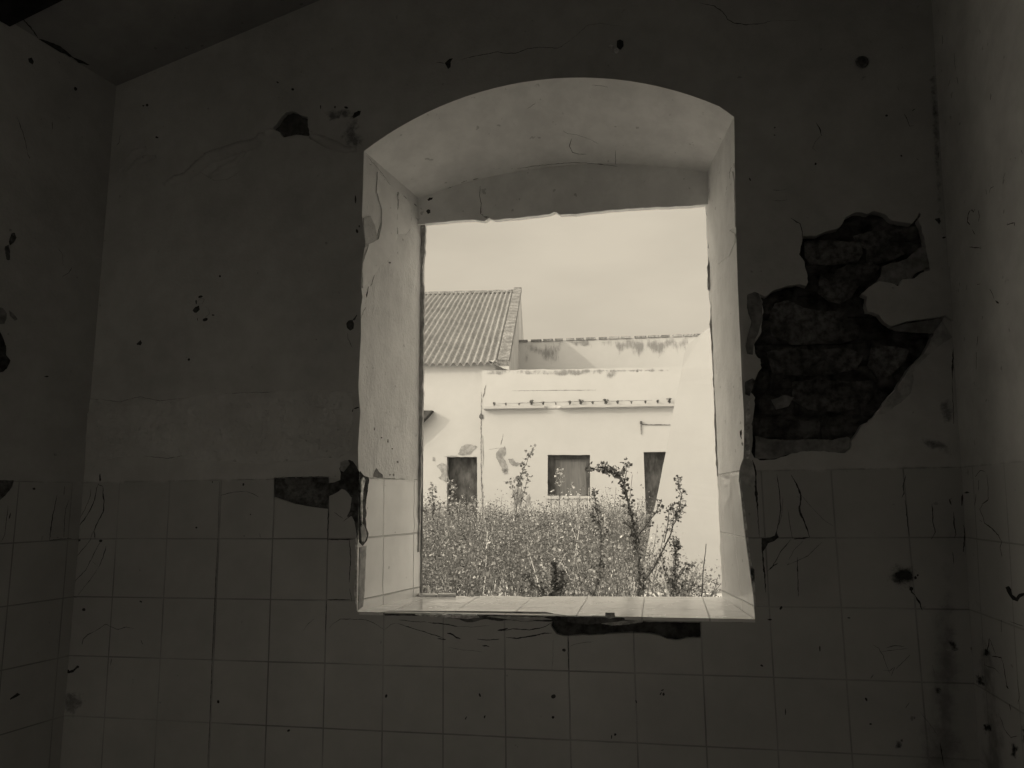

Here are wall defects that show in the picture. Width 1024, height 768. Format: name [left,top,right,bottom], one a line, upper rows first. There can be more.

flaking render [276,113,310,137]
flaking render [739,214,953,607]
spalling [275,460,398,610]
crack [305,512,586,668]
crack [752,460,828,597]